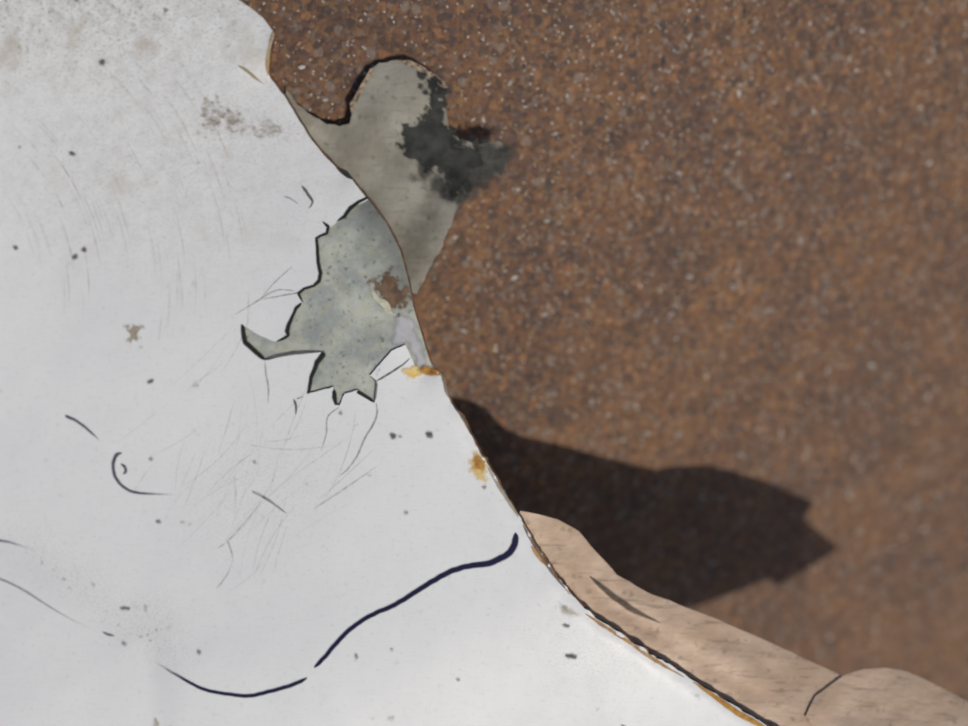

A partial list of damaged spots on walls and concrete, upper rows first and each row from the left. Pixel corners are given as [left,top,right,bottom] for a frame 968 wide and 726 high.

corrosion [238,32,274,83]
corrosion [350,68,374,113]
corrosion [397,60,447,88]
peeling [396,71,514,204]
corrosion [370,197,411,292]
peeling [241,197,435,405]
corrosion [402,366,472,435]
corrosion [471,453,569,593]